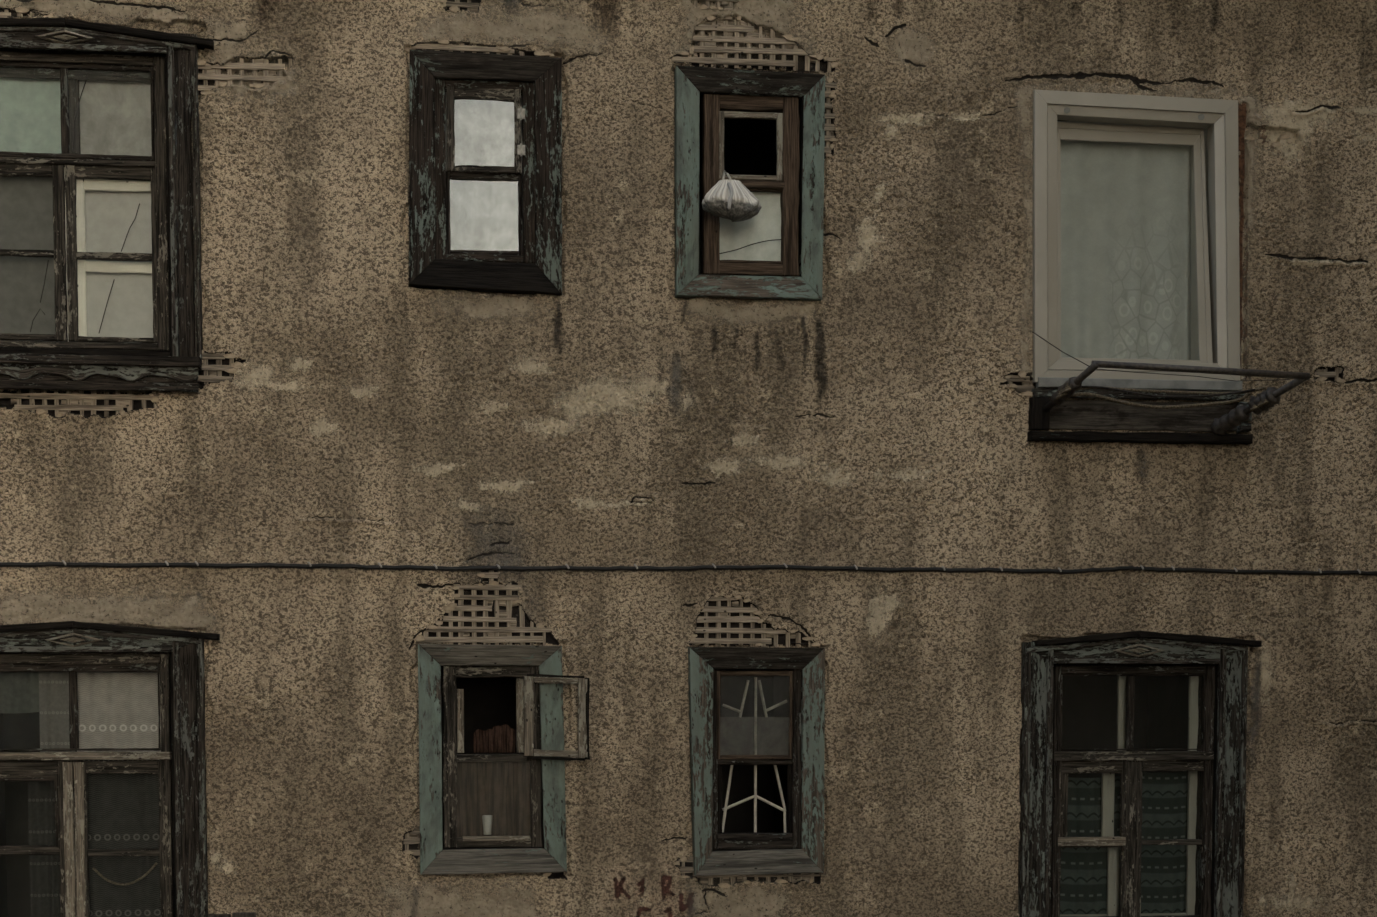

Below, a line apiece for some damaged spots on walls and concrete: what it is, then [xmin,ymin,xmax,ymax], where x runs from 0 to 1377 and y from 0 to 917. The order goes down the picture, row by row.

spalling [438,0,481,13]
peeling [197,18,299,105]
spalling [670,0,838,159]
crack [937,71,1224,118]
crack [1265,254,1368,264]
leakage [801,317,827,403]
crack [1310,376,1377,384]
spalling [413,517,559,645]
spalling [688,595,820,647]
peeling [381,878,546,917]
spalling [544,872,567,880]